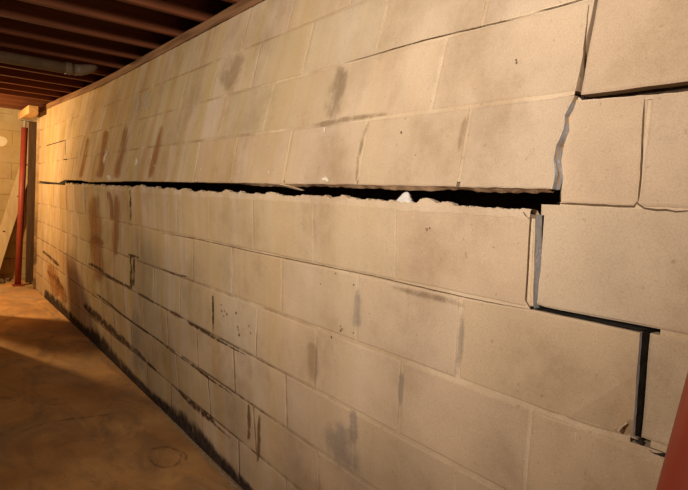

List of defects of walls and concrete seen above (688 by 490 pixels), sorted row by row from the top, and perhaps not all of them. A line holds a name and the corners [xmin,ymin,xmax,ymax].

rust [89,197,103,278]
rust [107,193,119,253]
water stain [89,254,139,289]
crack [40,85,688,457]
water stain [44,291,253,490]
water stain [247,405,260,460]